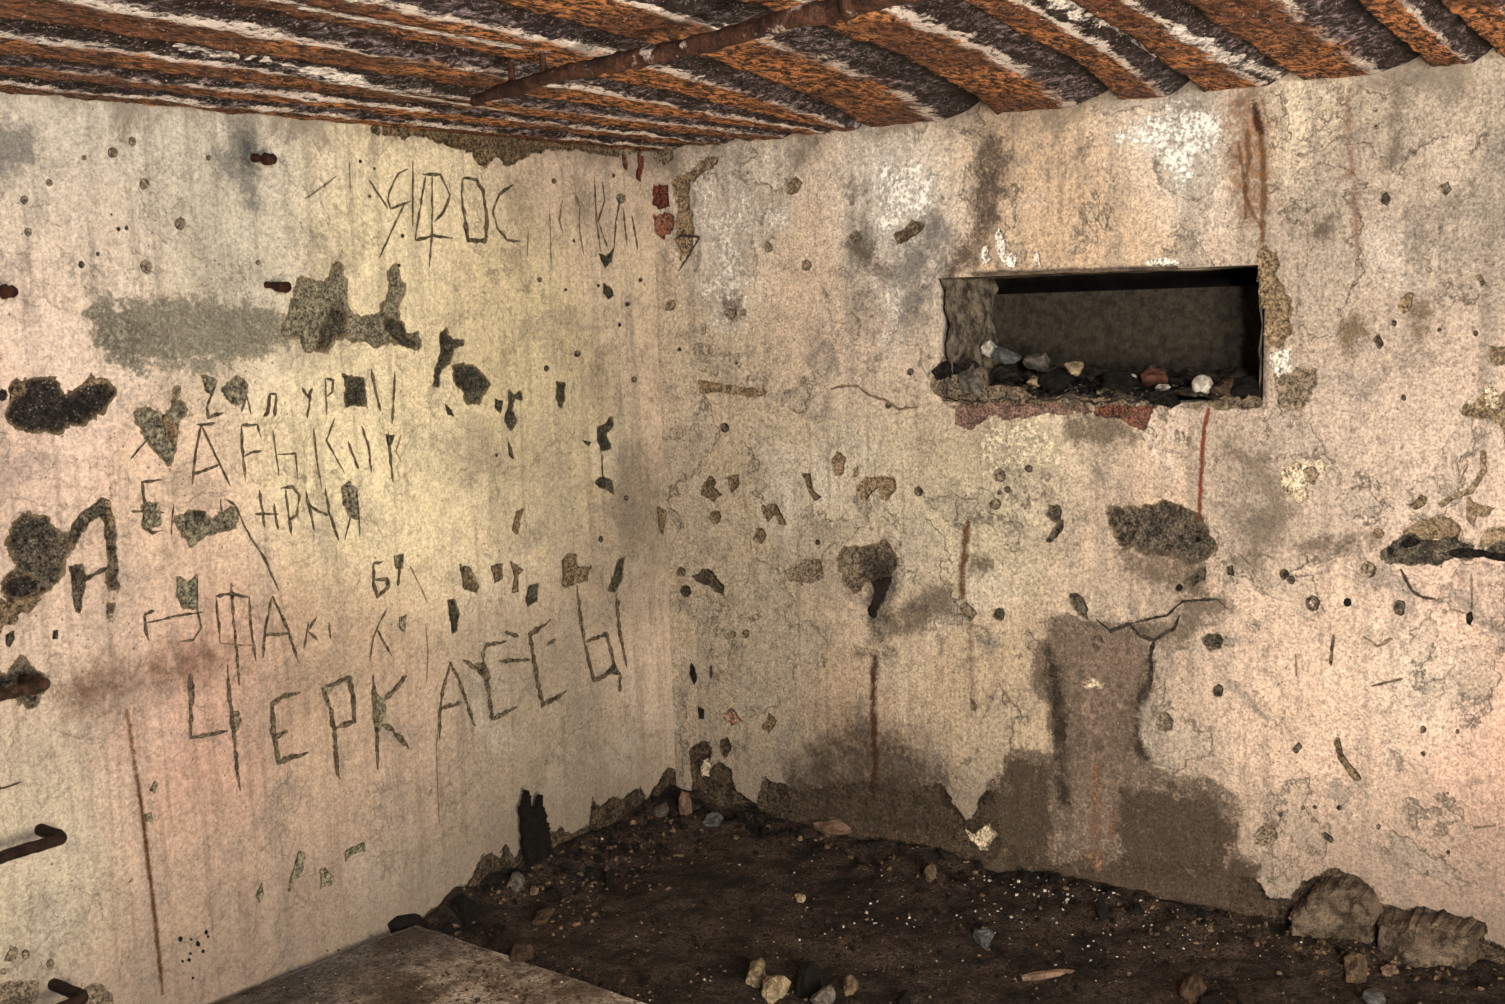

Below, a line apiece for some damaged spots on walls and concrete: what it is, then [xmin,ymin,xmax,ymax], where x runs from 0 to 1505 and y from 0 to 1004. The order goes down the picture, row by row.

flaking render [597,249,630,327]
flaking render [0,255,523,472]
flaking render [544,365,566,412]
flaking render [1459,330,1505,443]
flaking render [1372,450,1505,547]
flaking render [0,509,79,710]
flaking render [783,538,898,597]
crack [1096,598,1228,691]
flaking render [1106,499,1235,655]
leakage [550,612,1433,925]
leakage [464,844,524,888]
leakage [1476,920,1505,965]